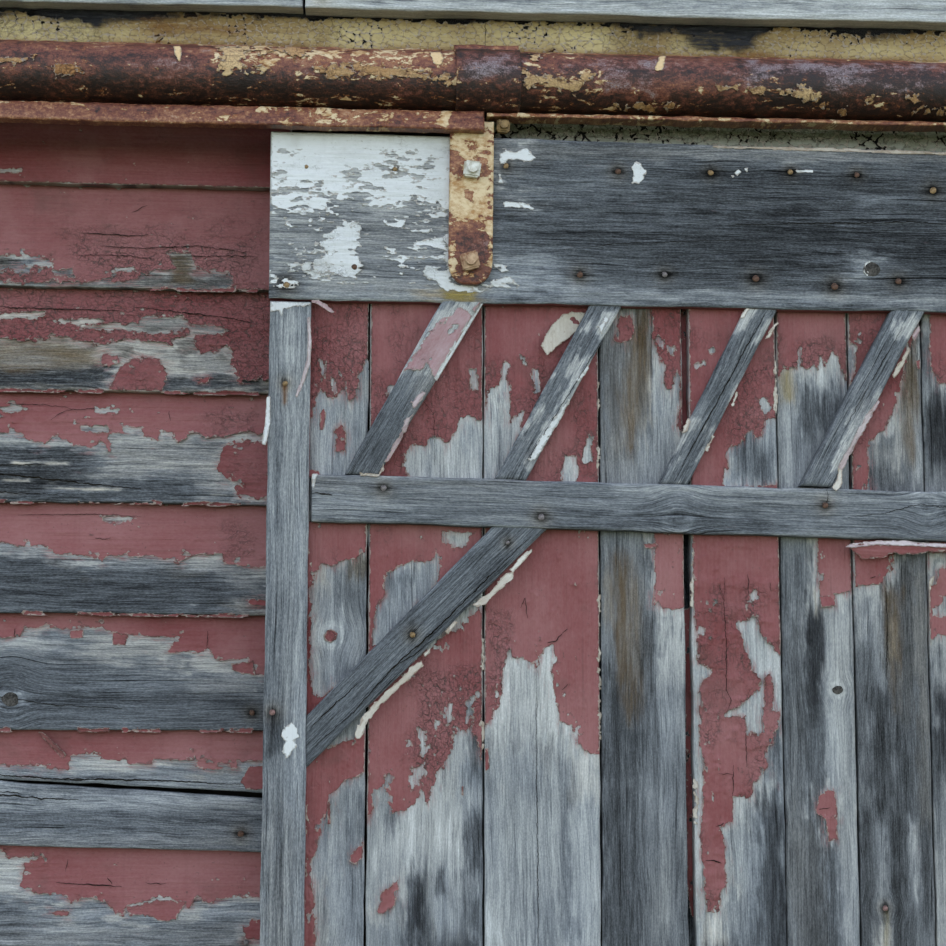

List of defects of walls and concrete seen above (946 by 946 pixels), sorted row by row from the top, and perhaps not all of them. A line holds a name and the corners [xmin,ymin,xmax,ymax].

peeling [0,10,946,97]
peeling [715,83,848,117]
peeling [494,123,946,183]
peeling [0,122,588,569]
peeling [526,351,600,482]
peeling [0,598,266,675]
peeling [817,538,946,608]
peeling [928,567,946,640]
peeling [0,726,263,790]
peeling [304,521,602,946]
peeling [644,533,781,917]
peeling [0,845,261,922]